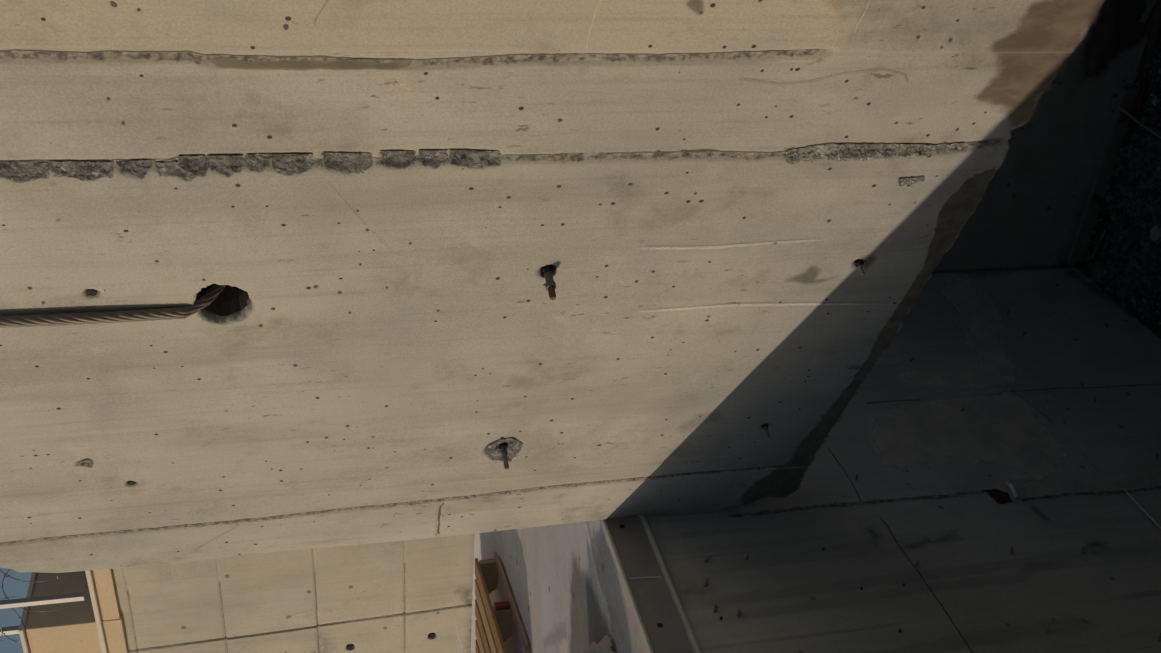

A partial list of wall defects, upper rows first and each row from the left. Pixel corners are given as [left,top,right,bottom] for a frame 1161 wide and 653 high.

damp [975,0,1157,127]
spalling [0,149,501,183]
damp [741,168,995,504]